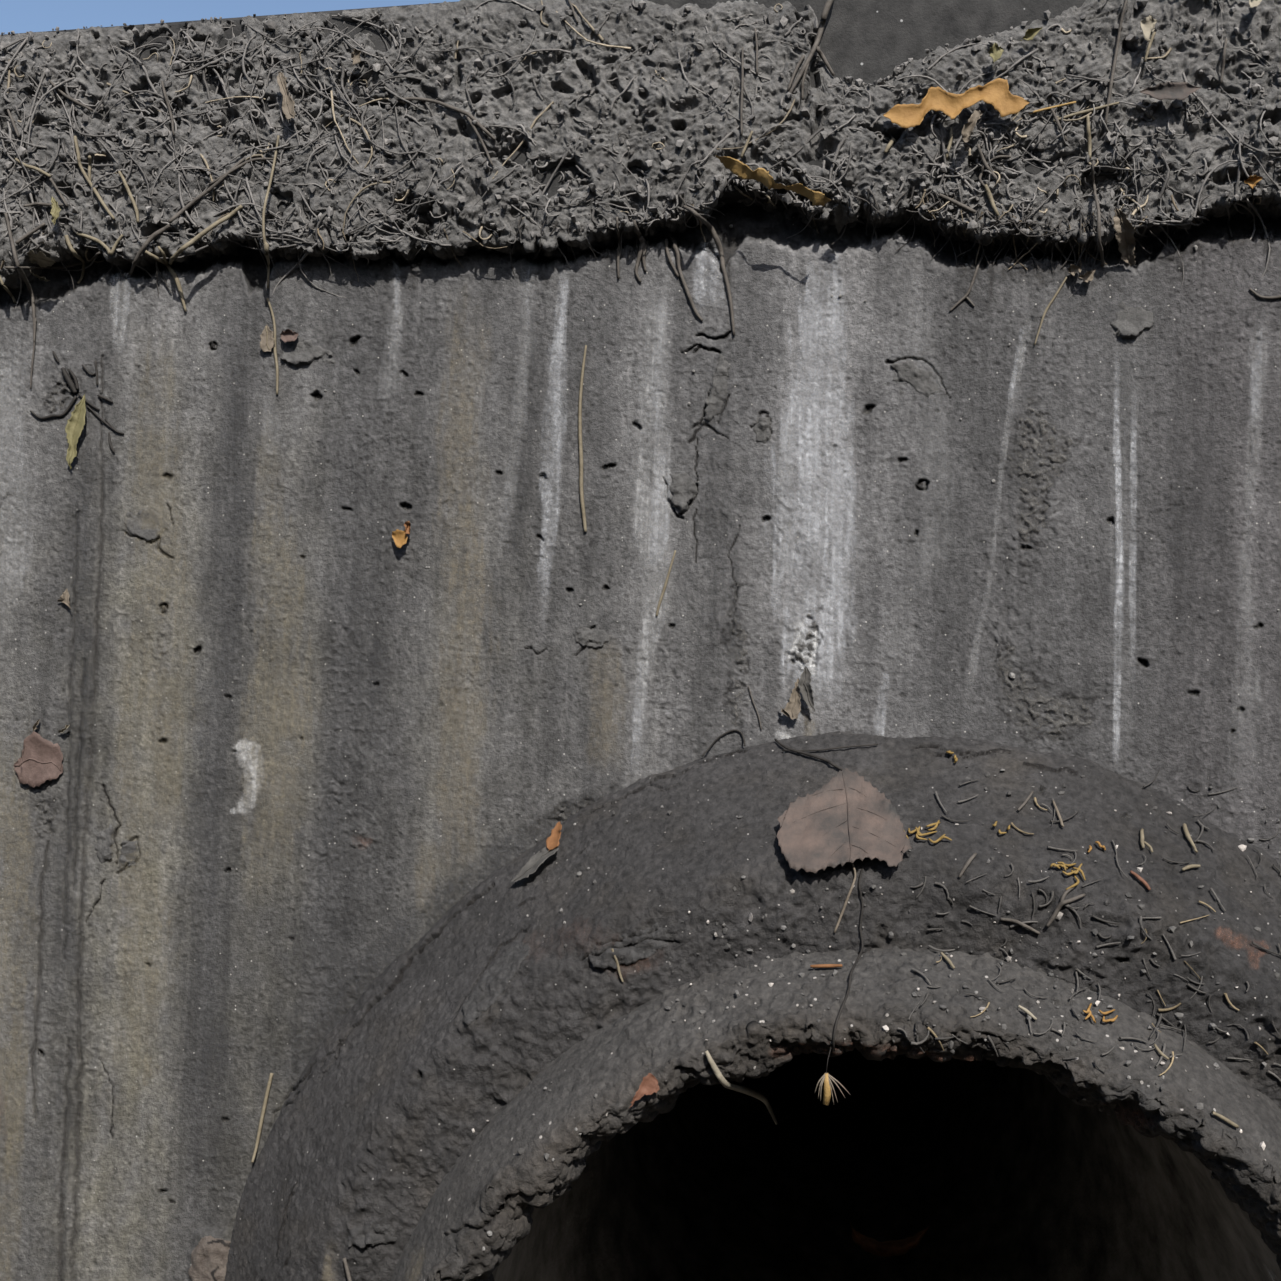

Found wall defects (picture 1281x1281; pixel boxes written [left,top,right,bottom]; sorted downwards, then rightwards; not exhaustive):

leakage [111,276,127,341]
leakage [640,311,666,424]
crack [682,331,731,353]
leakage [633,438,670,567]
crack [666,390,772,563]
crack [728,525,740,631]
leakage [774,360,853,678]
leakage [1115,406,1135,605]
leakage [637,584,666,729]
crack [292,884,493,1095]
crack [454,898,532,1019]